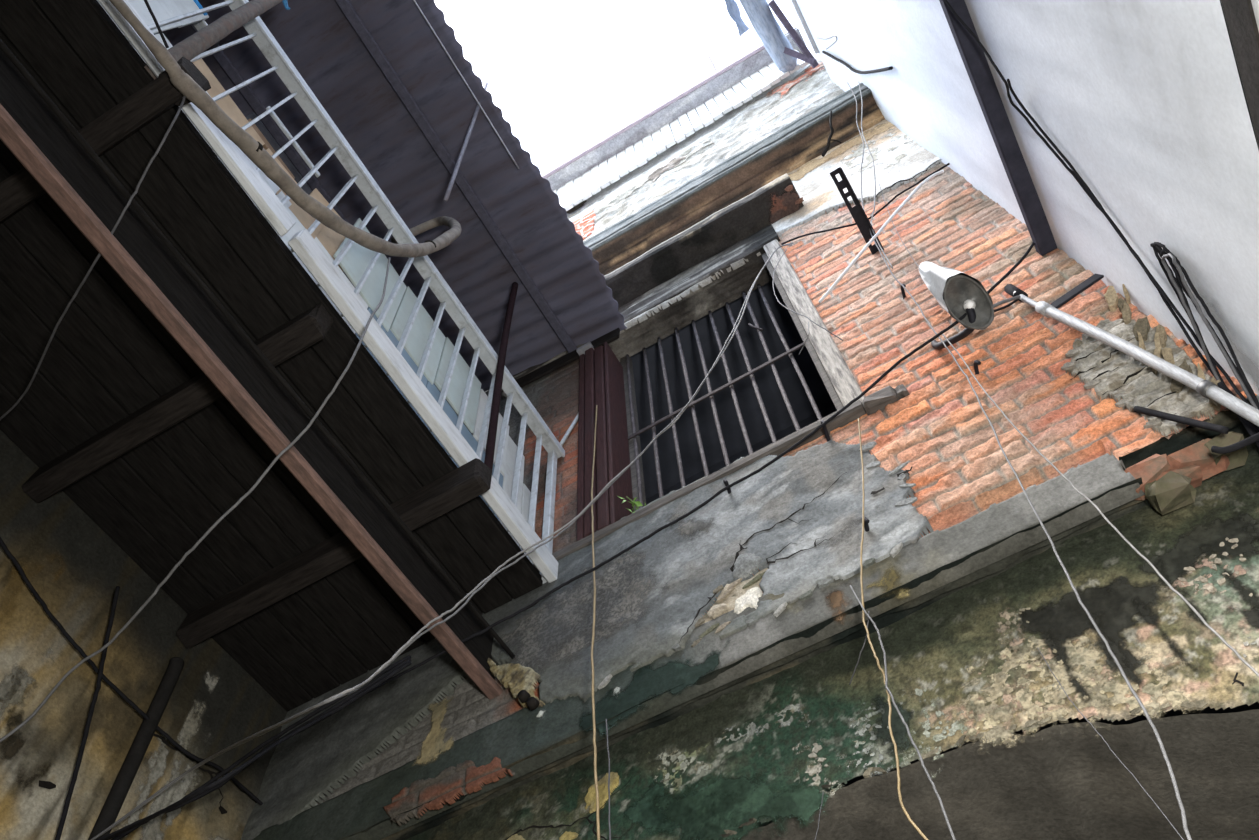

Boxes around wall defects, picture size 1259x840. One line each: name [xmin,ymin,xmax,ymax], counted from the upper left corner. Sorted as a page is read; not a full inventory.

peeling [1061,284,1221,436]
spalling [672,568,768,651]
water stain [1018,513,1259,703]
peeling [1161,537,1247,594]
water stain [0,666,36,760]
water stain [114,702,206,840]
water stain [205,672,218,691]
flaking render [383,757,515,826]
spalling [487,658,545,711]
peeling [655,703,811,794]
peeling [793,743,841,797]
peeling [842,608,1208,778]